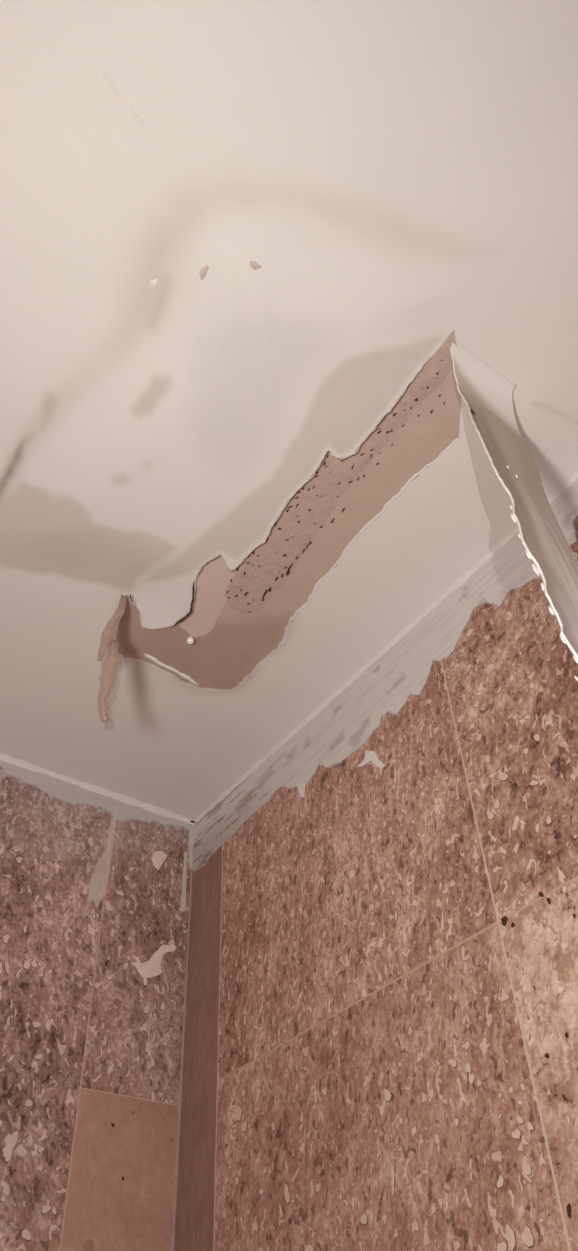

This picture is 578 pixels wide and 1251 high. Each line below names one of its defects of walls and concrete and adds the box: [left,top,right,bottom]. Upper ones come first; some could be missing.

peeling [97,330,578,722]